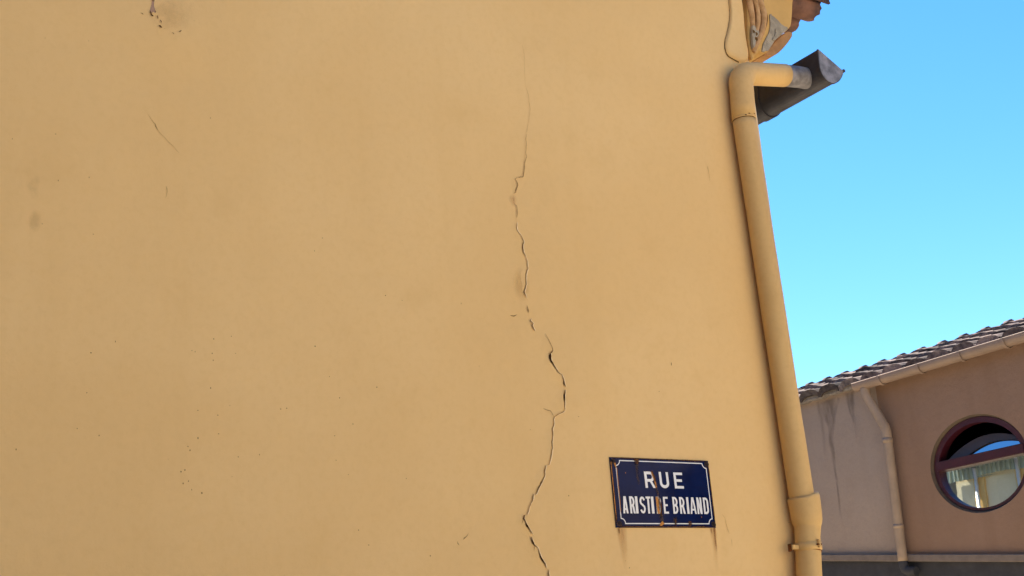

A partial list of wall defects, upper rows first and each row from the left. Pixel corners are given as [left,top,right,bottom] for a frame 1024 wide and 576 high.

crack [510,46,566,576]